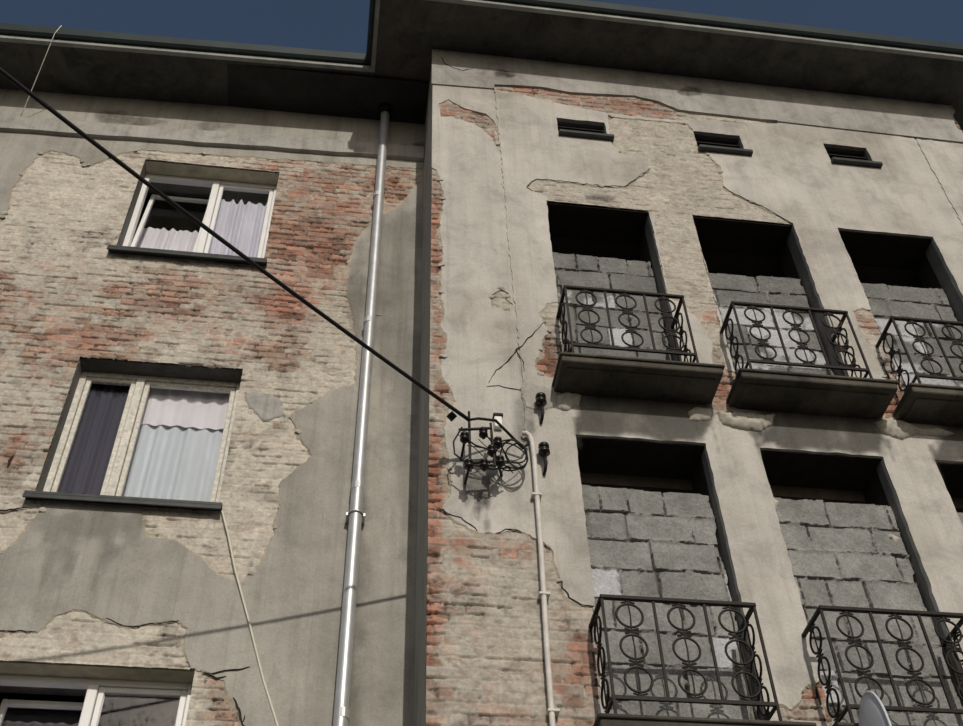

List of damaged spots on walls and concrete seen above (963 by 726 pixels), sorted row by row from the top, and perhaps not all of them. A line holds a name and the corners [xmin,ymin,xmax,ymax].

flaking render [439,100,501,149]
flaking render [493,86,792,414]
crack [487,322,546,391]
flaking render [853,308,904,420]
flaking render [0,149,601,726]
crack [202,666,250,726]